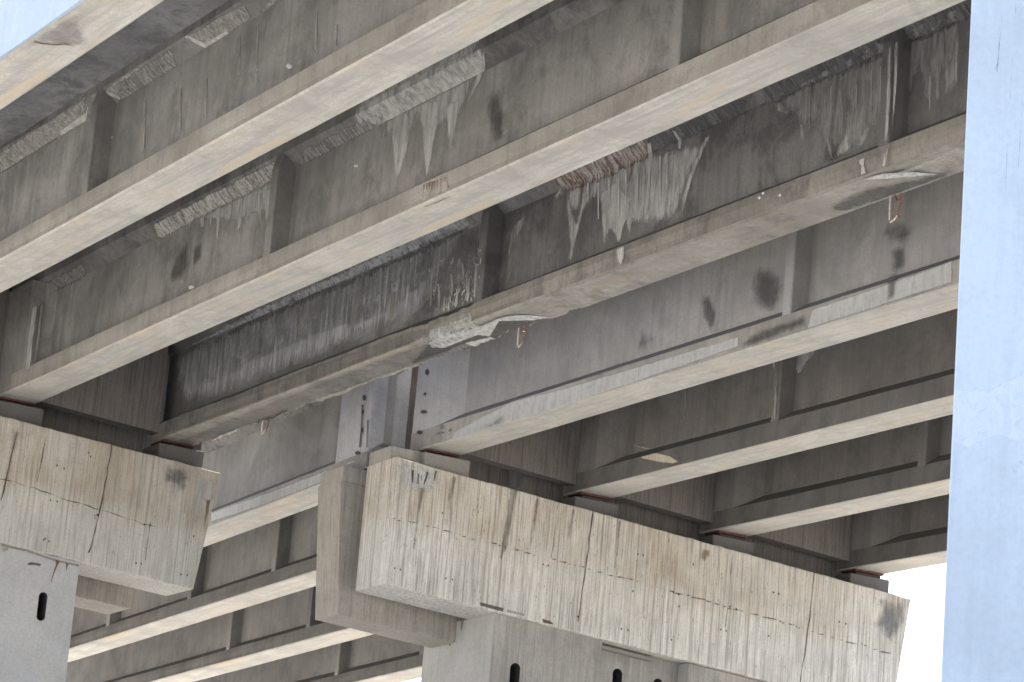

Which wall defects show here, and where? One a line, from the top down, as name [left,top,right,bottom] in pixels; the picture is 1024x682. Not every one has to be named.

leakage [302,40,485,176]
leakage [763,0,971,210]
leakage [154,162,275,239]
leakage [555,98,746,264]
spalling [327,248,551,396]
crack [1,429,155,560]
crack [493,506,638,622]
leakage [879,604,902,637]